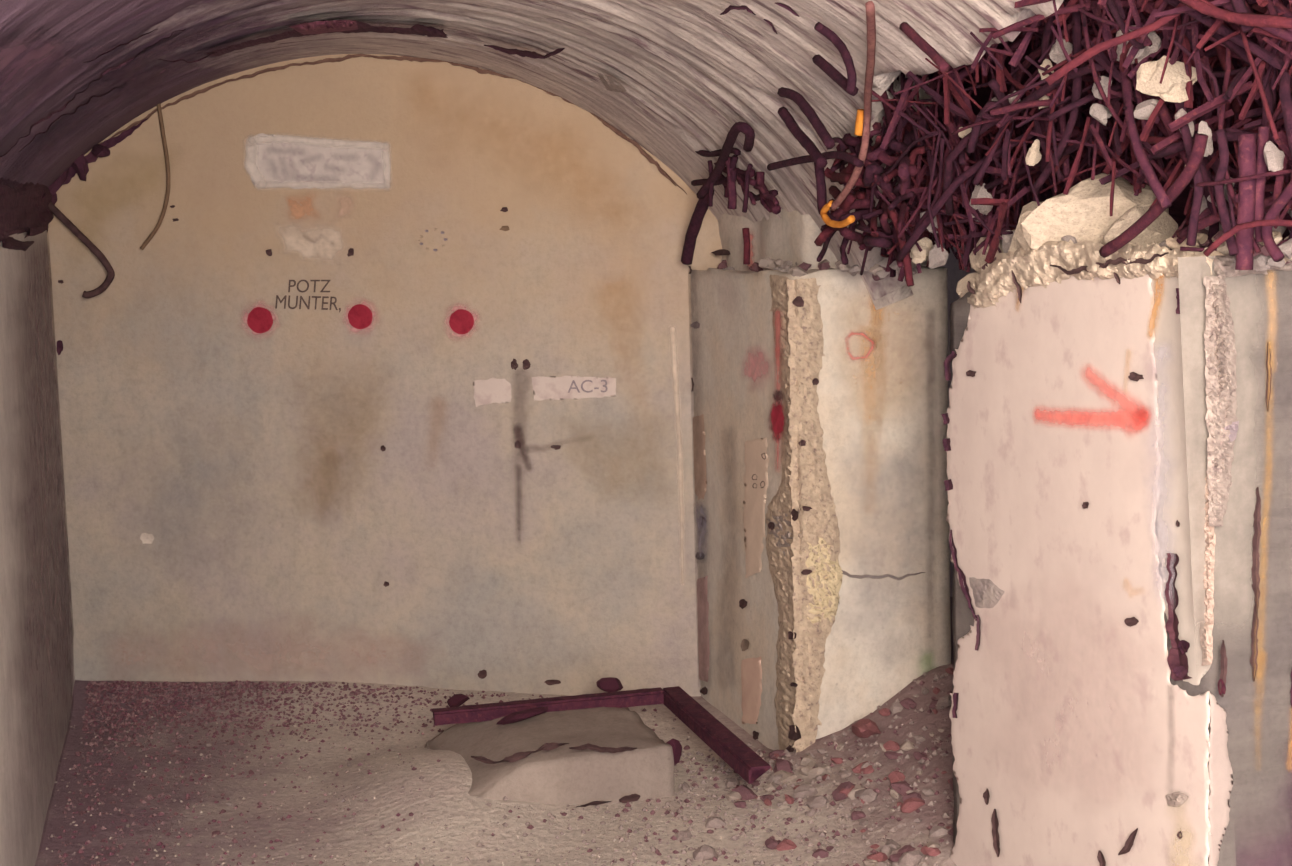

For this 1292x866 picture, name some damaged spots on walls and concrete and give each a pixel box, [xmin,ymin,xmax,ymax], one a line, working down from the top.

spalling [0,177,54,251]
peeling [681,0,1292,866]
crack [838,570,925,604]